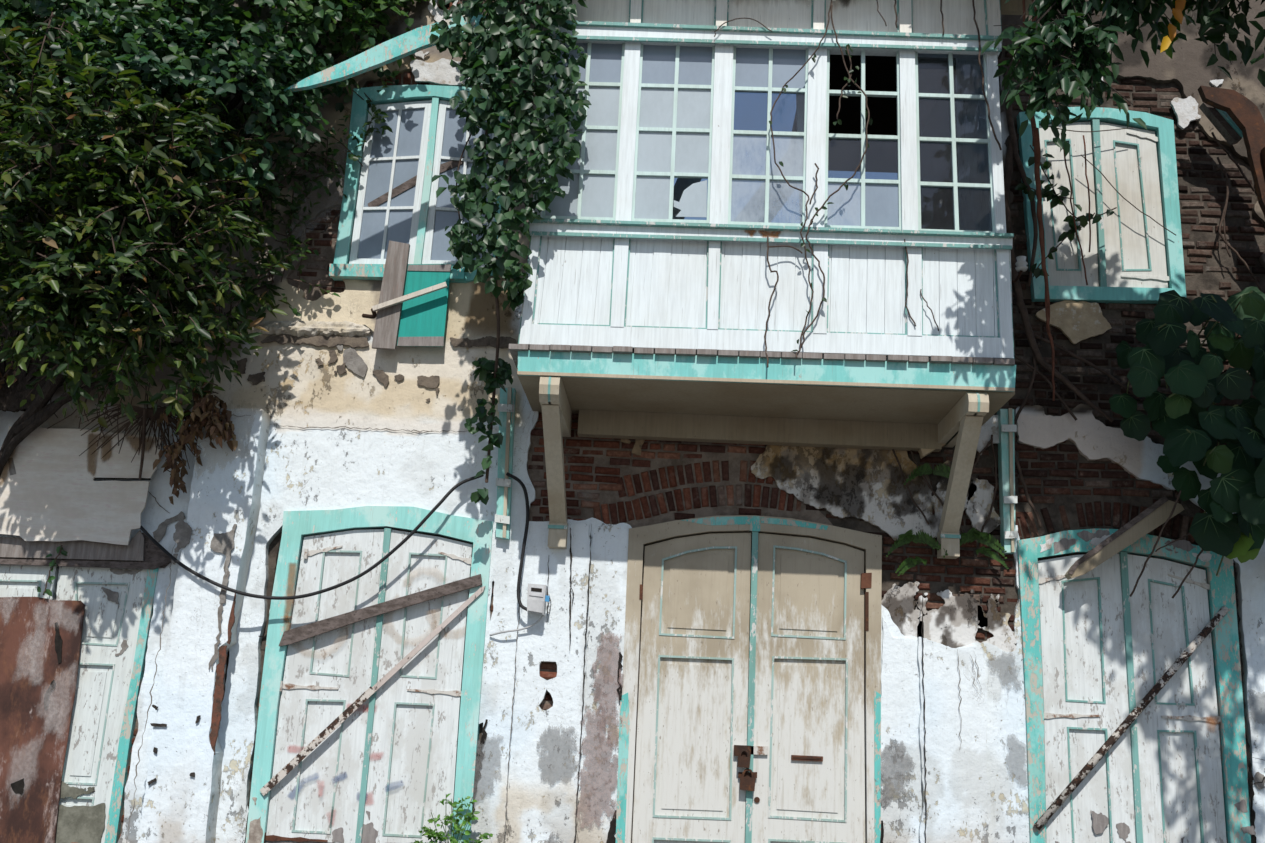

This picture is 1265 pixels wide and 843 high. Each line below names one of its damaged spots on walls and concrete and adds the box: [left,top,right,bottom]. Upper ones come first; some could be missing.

flaking render [994,48,1265,445]
flaking render [237,358,265,385]
flaking render [261,334,440,402]
flaking render [450,336,516,348]
flaking render [527,412,550,522]
flaking render [153,511,192,565]
flaking render [562,414,1212,652]
leakage [536,632,623,830]
crack [1233,559,1265,843]